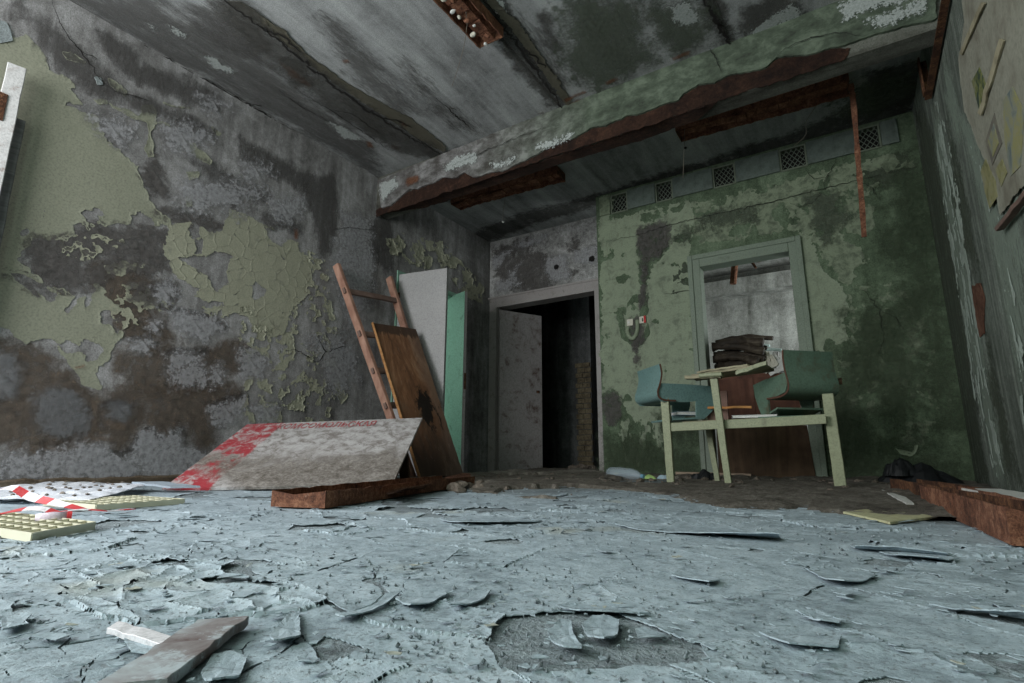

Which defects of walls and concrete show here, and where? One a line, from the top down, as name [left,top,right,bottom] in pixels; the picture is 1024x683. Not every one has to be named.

leakage [187,0,442,158]
crack [144,0,562,169]
spalling [376,48,850,217]
leakage [480,0,807,107]
peeling [668,0,700,26]
peeling [751,3,803,34]
peeling [837,0,928,29]
peeling [0,34,348,423]
leakage [0,0,394,480]
leakage [476,60,1024,488]
peeling [935,101,1004,475]
peeling [0,486,1024,683]